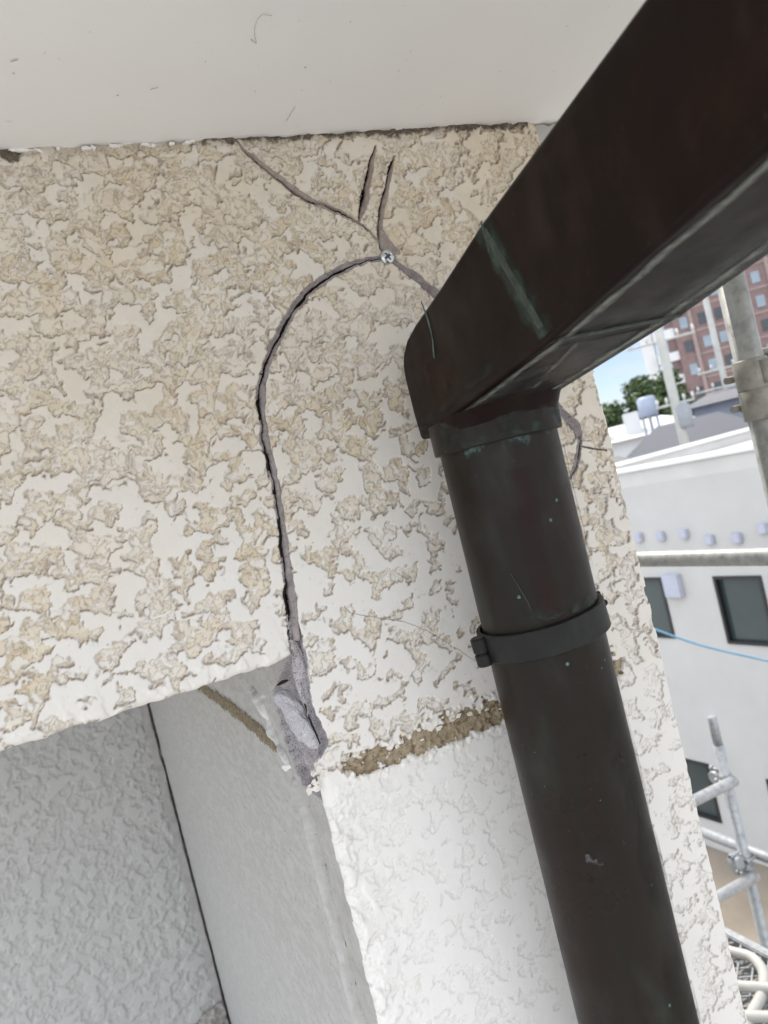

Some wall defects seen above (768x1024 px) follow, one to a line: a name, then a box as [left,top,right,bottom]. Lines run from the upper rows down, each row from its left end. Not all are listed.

crack [236,140,439,641]
crack [558,402,607,478]
spalling [198,617,504,797]
crack [344,607,473,660]